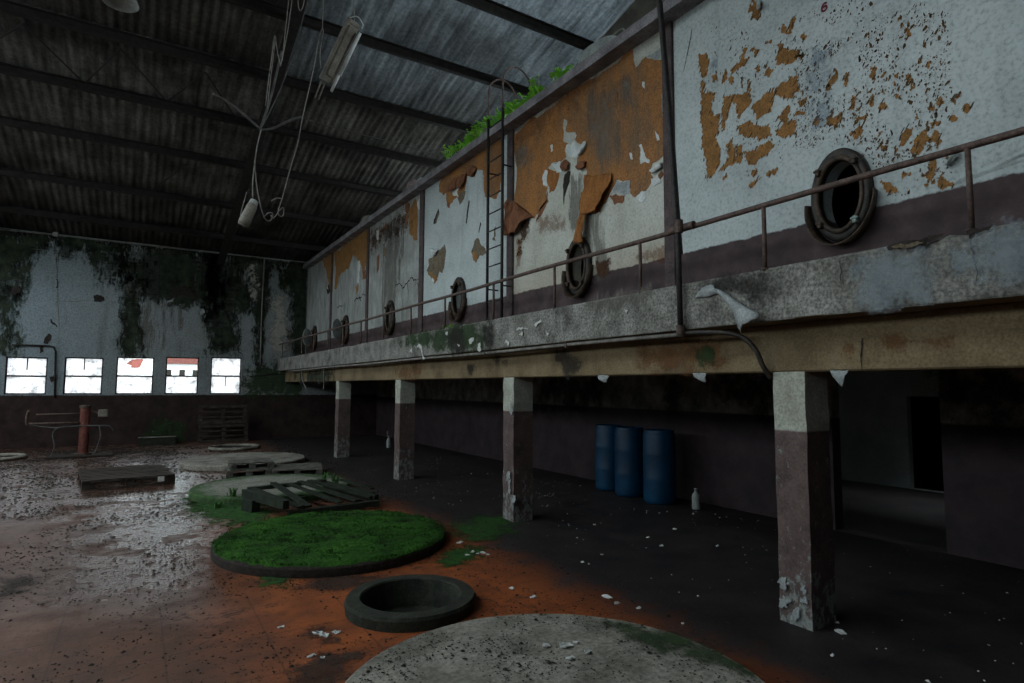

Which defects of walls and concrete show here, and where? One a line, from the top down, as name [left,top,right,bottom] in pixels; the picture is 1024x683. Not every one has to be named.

peeling [698,0,974,196]
peeling [433,48,663,262]
peeling [322,223,388,295]
flaking render [427,245,446,284]
damp [247,263,291,359]
damp [448,325,464,356]
peeling [777,577,808,621]